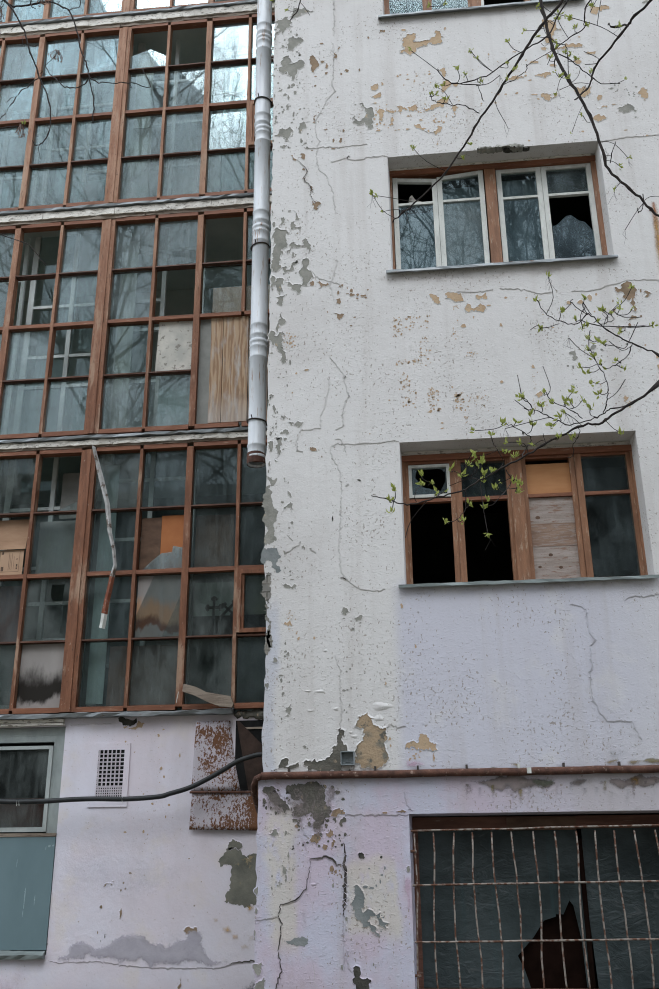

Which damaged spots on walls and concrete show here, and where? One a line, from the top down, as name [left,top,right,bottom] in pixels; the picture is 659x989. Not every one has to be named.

peeling [271,1,460,211]
spalling [477,140,530,154]
peeling [267,210,369,393]
crack [285,358,399,592]
crack [570,604,642,740]
rust [189,721,263,831]
spalling [259,687,391,890]
crack [347,792,413,817]
peeling [59,926,217,967]
crack [49,819,352,989]
spalling [218,838,259,914]
spalling [340,963,374,989]